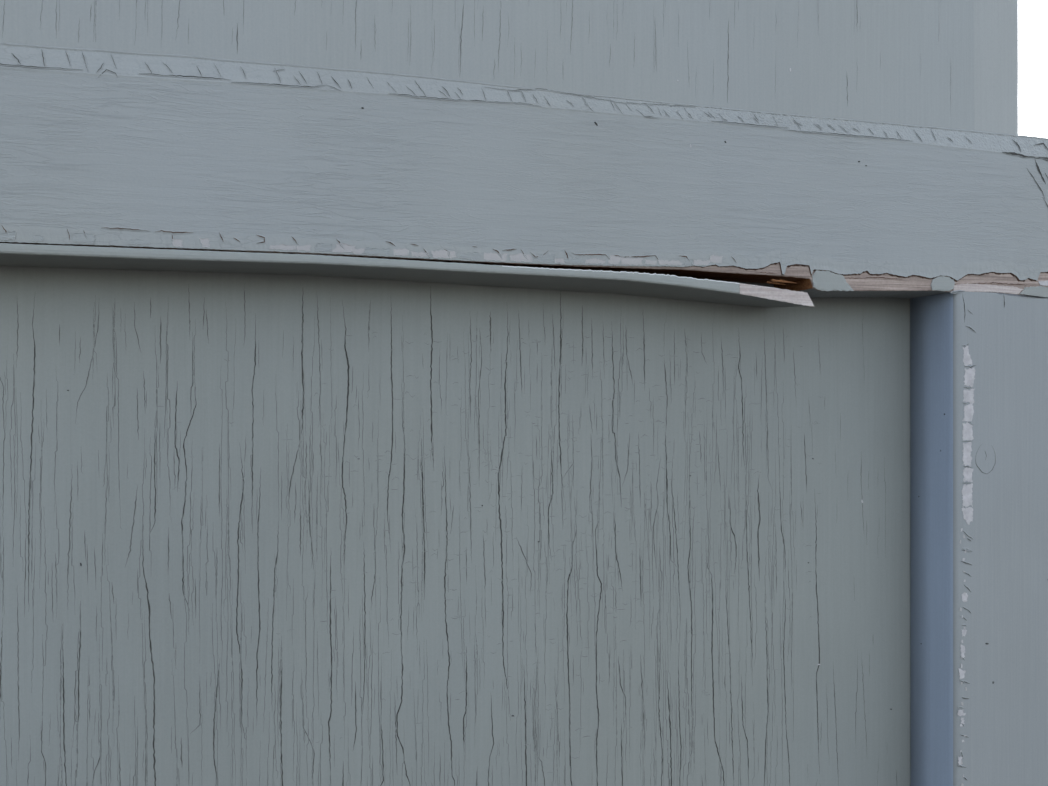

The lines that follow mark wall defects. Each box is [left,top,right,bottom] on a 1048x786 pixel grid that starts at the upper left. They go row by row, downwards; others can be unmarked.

crack [1002,139,1048,208]
peeling [66,226,241,248]
peeling [256,234,737,266]
peeling [739,270,903,307]
peeling [931,276,1048,297]
peeling [957,309,977,786]